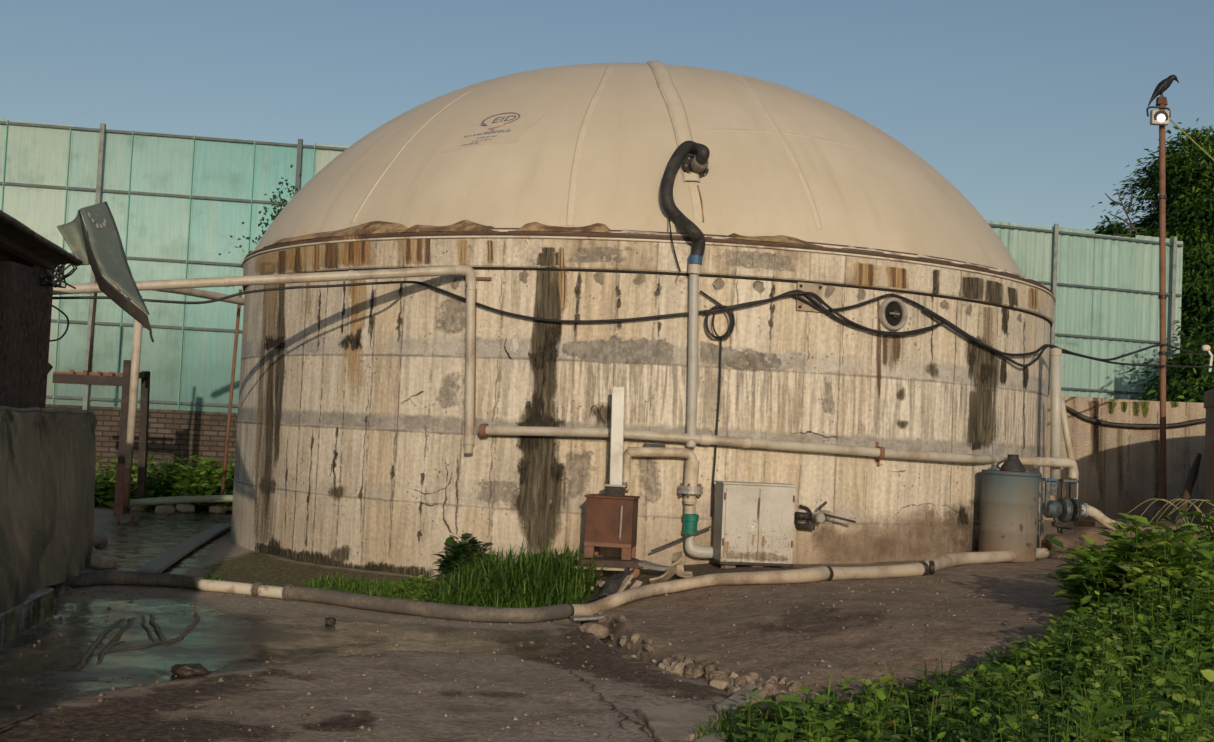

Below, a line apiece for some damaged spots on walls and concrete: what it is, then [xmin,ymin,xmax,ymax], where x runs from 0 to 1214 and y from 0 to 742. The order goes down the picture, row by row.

leakage [254,263,285,557]
corrosion [255,235,372,388]
crack [285,391,459,550]
leakage [504,247,566,552]
corrosion [855,263,907,395]
leakage [963,277,1018,450]
leakage [331,546,349,563]
leakage [365,561,387,571]